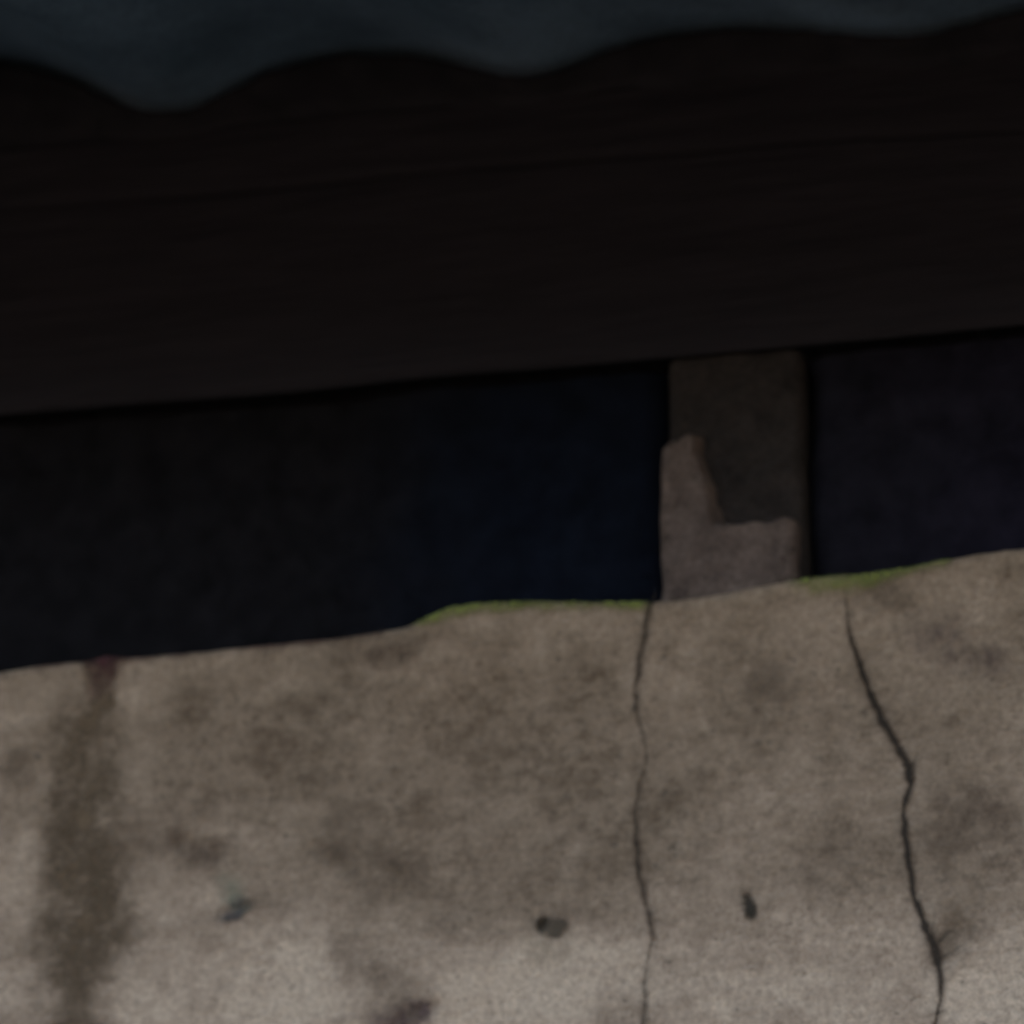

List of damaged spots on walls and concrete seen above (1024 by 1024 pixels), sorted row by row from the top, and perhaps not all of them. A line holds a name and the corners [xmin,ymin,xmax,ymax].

damp [45,656,127,1023]
crack [634,756,653,1024]
crack [635,593,655,729]
crack [845,595,950,1024]